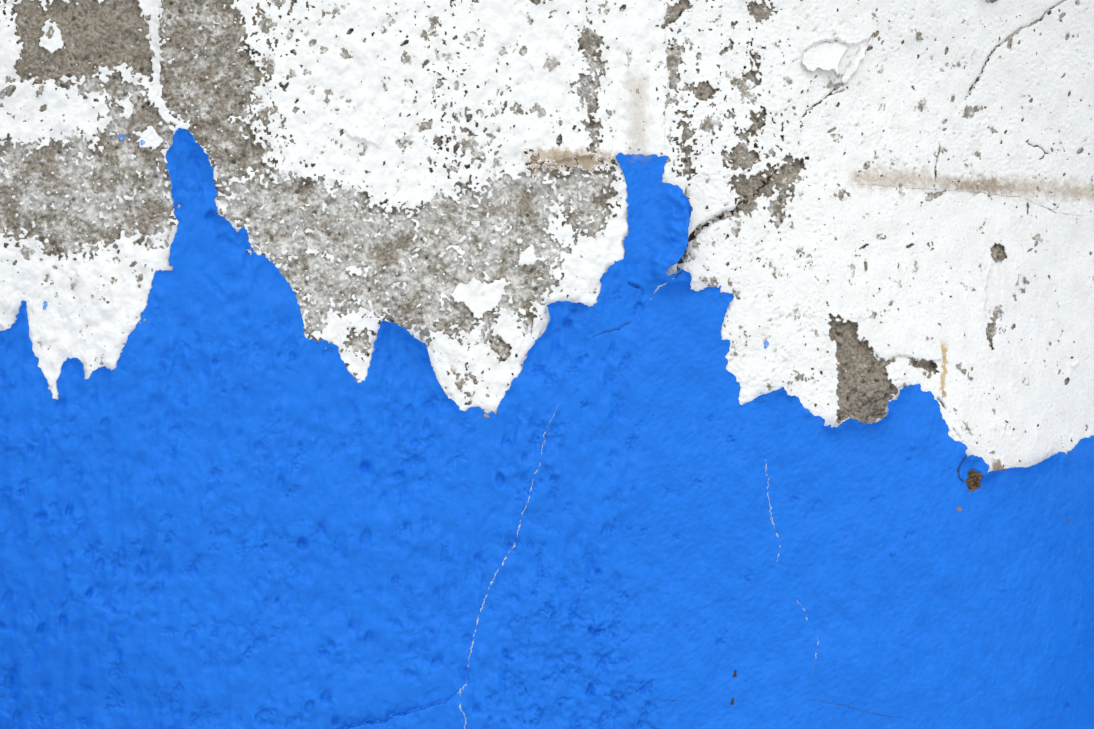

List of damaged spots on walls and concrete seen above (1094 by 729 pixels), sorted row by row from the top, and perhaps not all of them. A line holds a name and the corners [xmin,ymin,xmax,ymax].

spalling [0,0,642,418]
crack [634,169,777,299]
peeling [646,0,1094,493]
crack [966,3,1077,97]
crack [346,406,558,729]